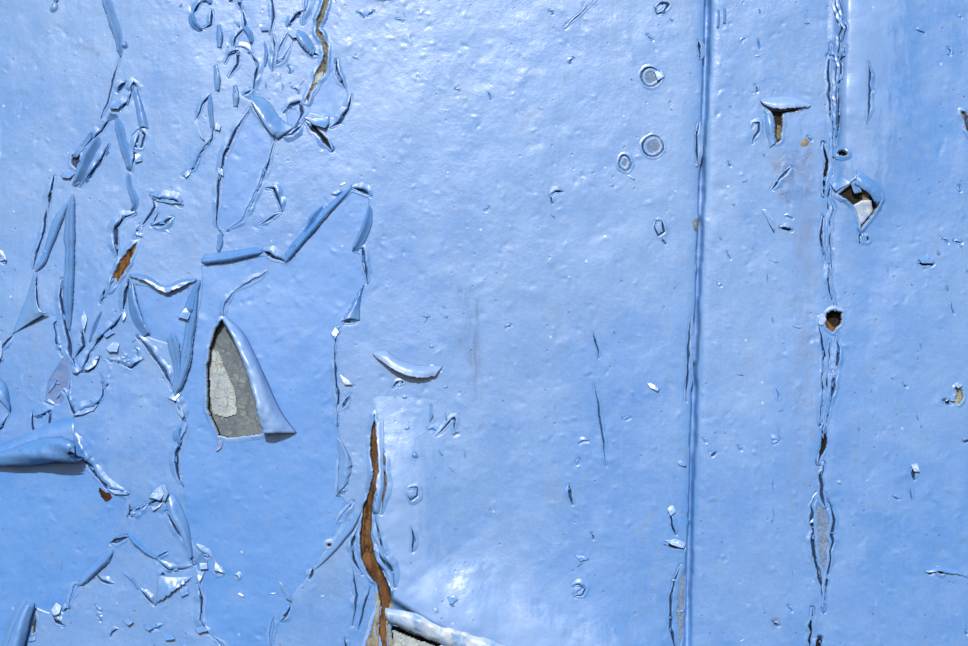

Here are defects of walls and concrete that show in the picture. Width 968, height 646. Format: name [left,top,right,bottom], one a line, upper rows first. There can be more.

crack [213,24,254,107]
crack [300,0,332,107]
peeling [750,85,811,157]
peeling [957,95,968,140]
peeling [831,171,886,246]
corrosion [98,224,143,305]
peeling [0,0,373,646]
spalling [816,305,846,336]
crack [803,0,876,646]
peeling [373,350,443,398]
peeling [944,382,968,408]
peeling [342,602,506,646]